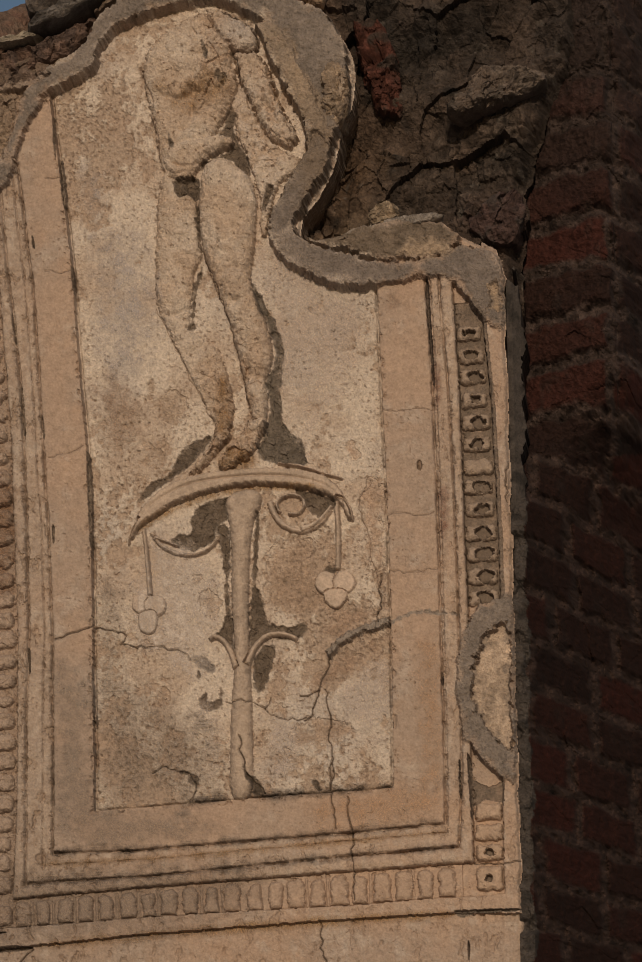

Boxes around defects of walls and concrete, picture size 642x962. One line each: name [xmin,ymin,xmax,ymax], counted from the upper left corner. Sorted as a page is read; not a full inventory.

spalling [214,68,227,87]
flaking render [0,94,23,157]
spalling [53,118,69,212]
spalling [172,107,251,252]
spalling [261,183,275,212]
flaking render [307,219,463,263]
spalling [86,452,95,561]
crack [55,627,191,661]
crack [227,482,467,900]
flaking render [469,620,517,754]
crack [152,766,197,800]